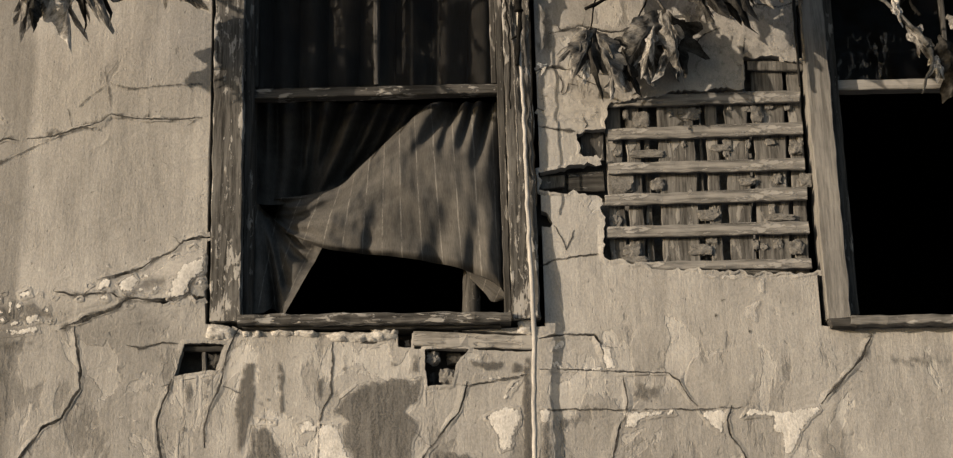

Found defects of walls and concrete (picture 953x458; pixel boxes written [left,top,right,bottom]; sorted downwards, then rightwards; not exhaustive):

crack [0,72,202,164]
flaking render [535,0,822,321]
peeling [0,286,69,339]
crack [13,232,211,458]
peeling [74,243,209,311]
crack [198,326,242,448]
spalling [171,324,474,390]
peeling [480,374,524,454]
peeling [538,406,554,426]
crack [417,330,750,458]
peeling [696,404,823,458]
crack [819,333,873,405]